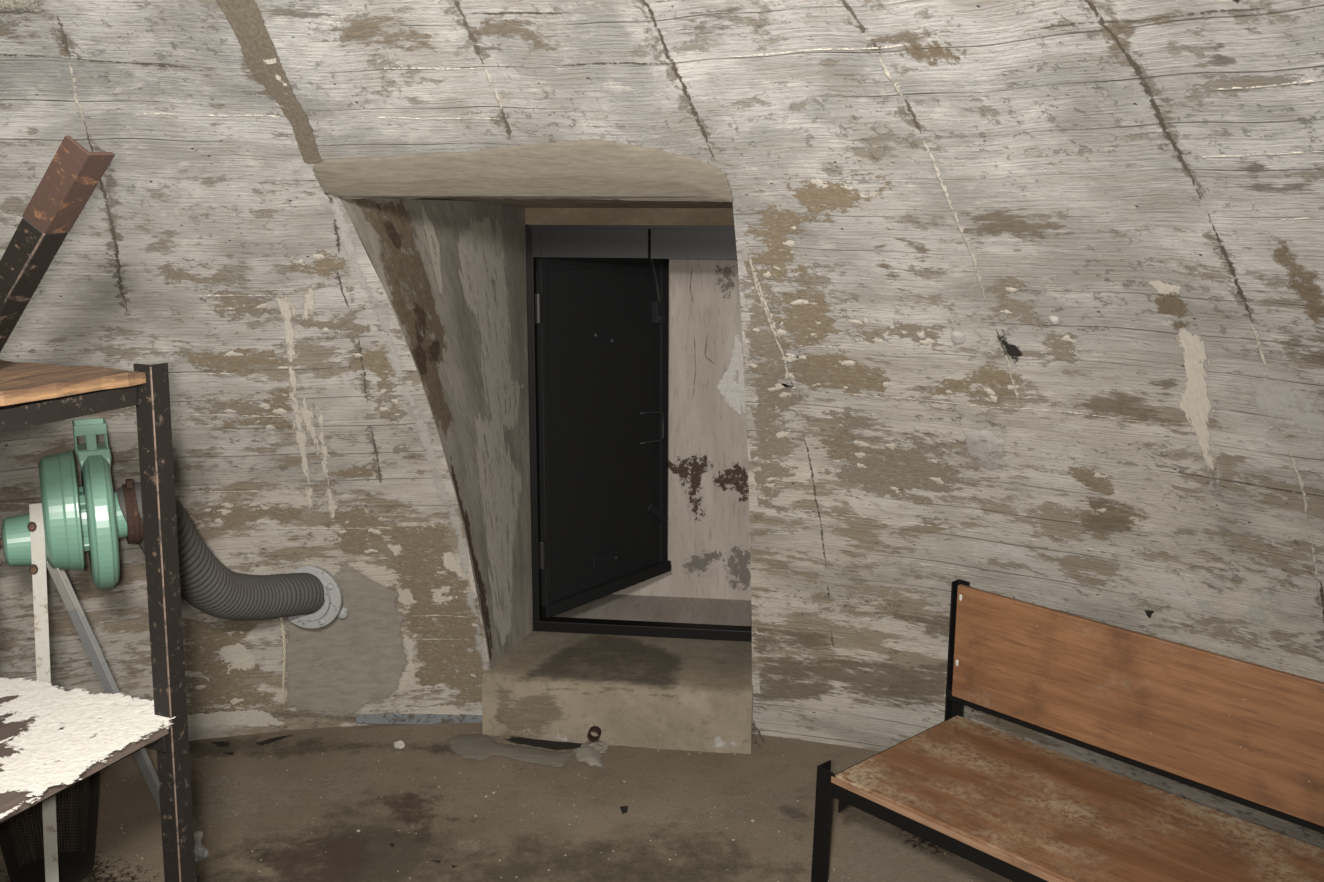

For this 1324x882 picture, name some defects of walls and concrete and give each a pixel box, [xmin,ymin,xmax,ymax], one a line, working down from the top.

crack [1027,8,1264,31]
crack [555,60,668,68]
crack [501,108,512,139]
crack [1208,214,1252,321]
crack [1316,580,1324,622]